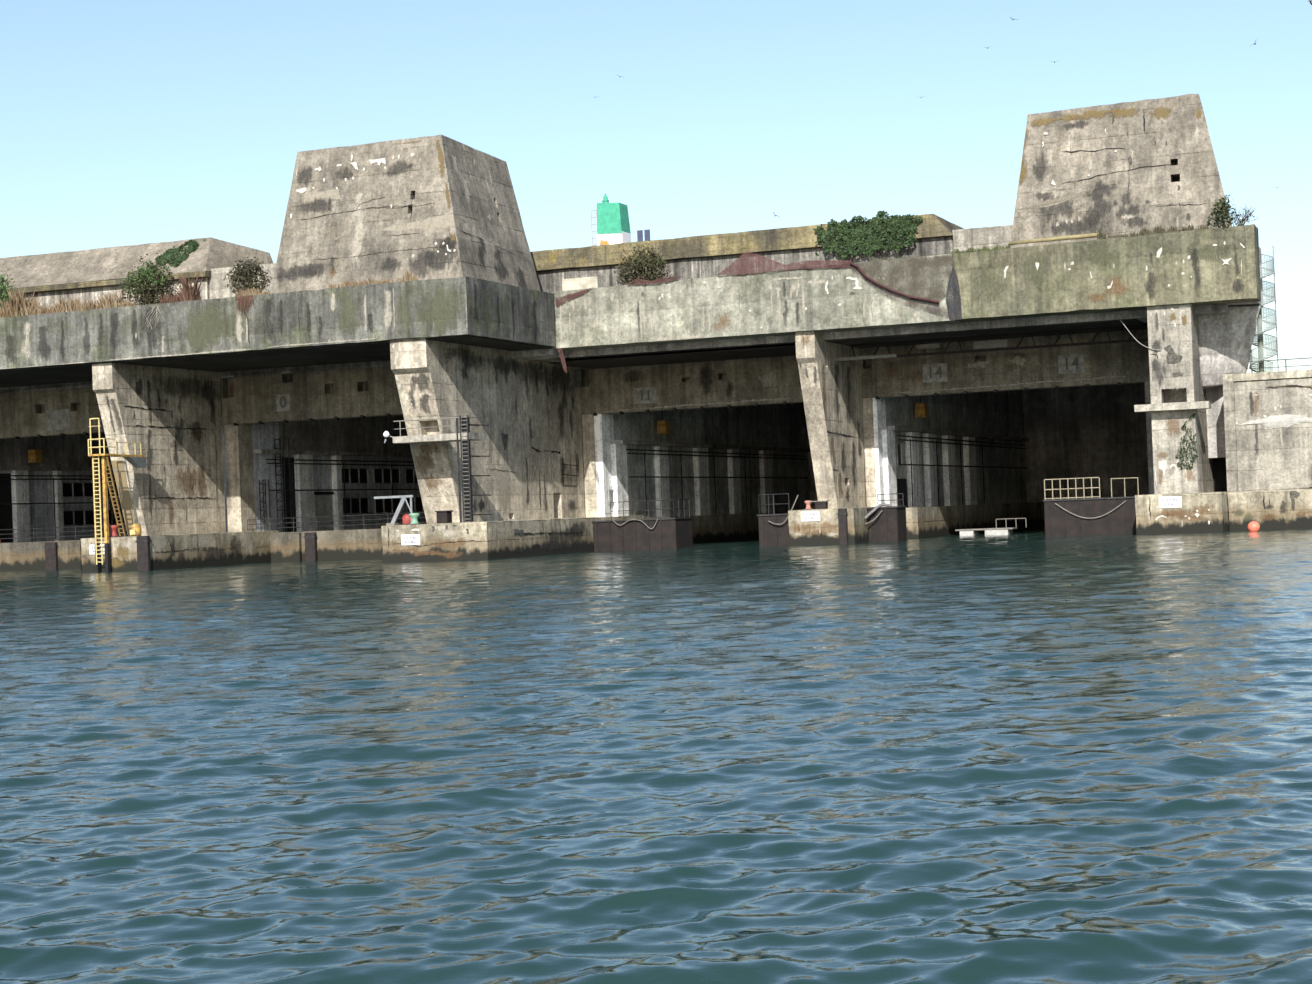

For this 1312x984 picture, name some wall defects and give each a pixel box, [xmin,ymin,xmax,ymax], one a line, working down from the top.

water stain [301,199,336,213]
water stain [352,193,364,261]
water stain [388,163,412,175]
water stain [1033,150,1148,235]
water stain [277,257,334,281]
water stain [4,308,249,369]
water stain [1149,310,1192,387]
water stain [410,373,430,413]
water stain [448,348,585,552]